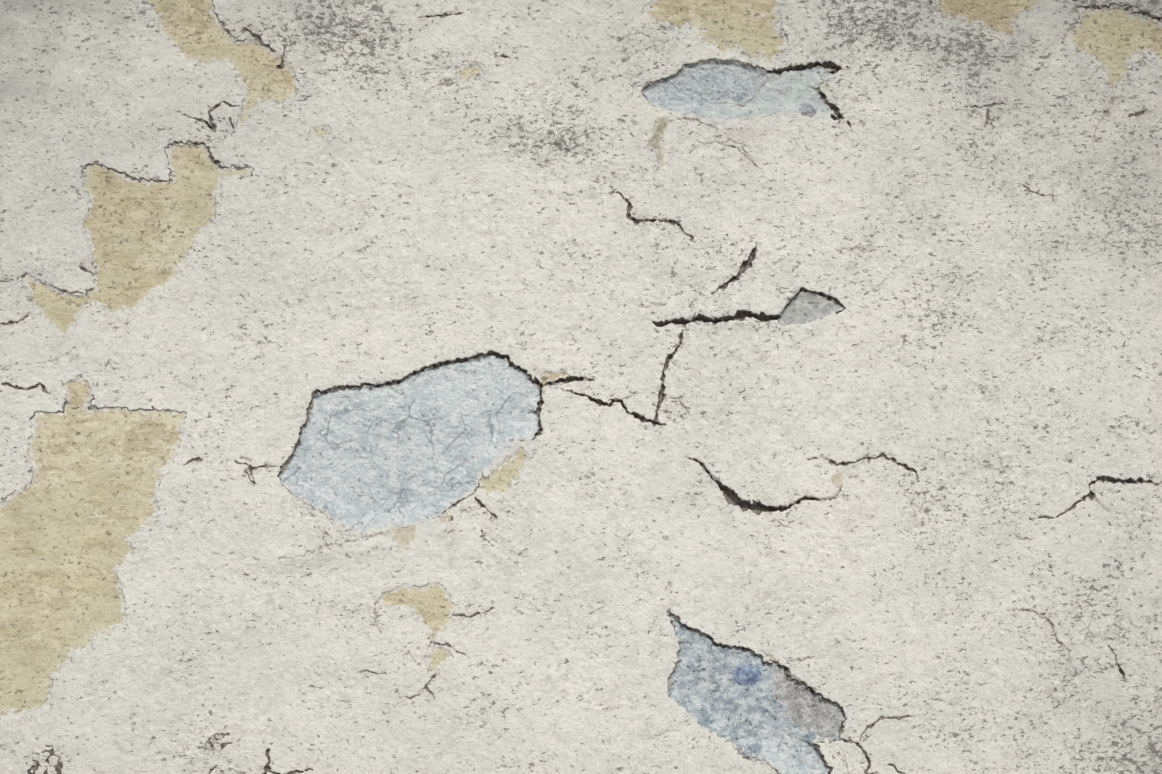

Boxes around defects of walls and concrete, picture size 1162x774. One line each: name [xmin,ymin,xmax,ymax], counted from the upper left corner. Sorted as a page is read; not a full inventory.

peeling [135,0,299,135]
flaking render [641,0,852,169]
crack [1072,0,1162,22]
peeling [21,142,253,343]
crack [609,191,696,243]
crack [561,242,781,426]
peeling [0,376,186,720]
flaking render [240,350,595,560]
crack [687,453,920,528]
crack [1013,476,1162,541]
crack [209,749,313,774]
flaking render [667,609,912,774]